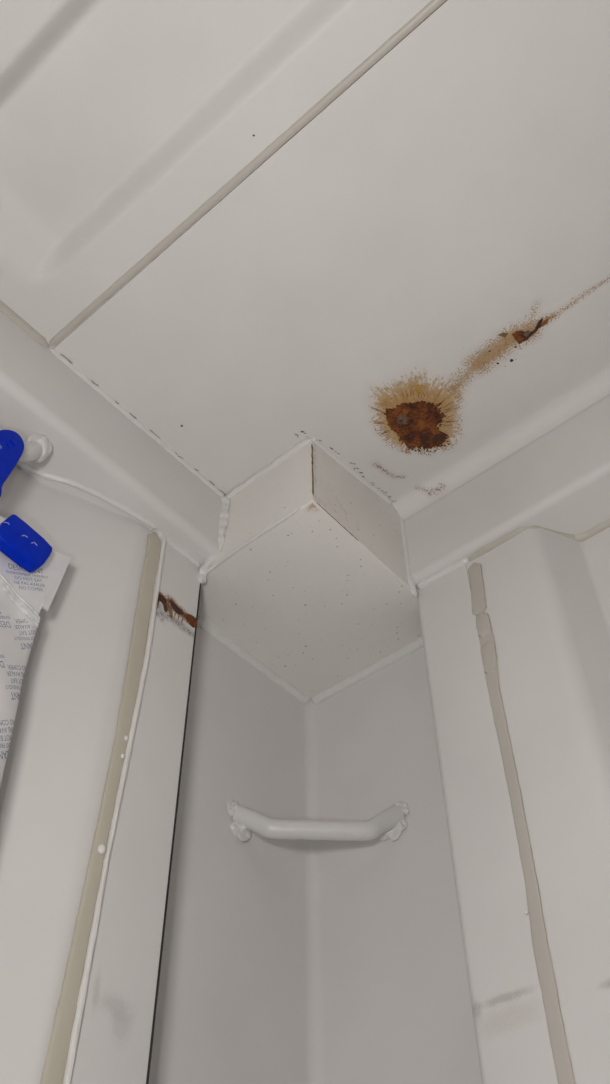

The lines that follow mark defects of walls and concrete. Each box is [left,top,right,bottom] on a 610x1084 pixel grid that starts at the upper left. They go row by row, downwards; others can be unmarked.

corrosion [369,277,608,455]
corrosion [156,592,197,628]